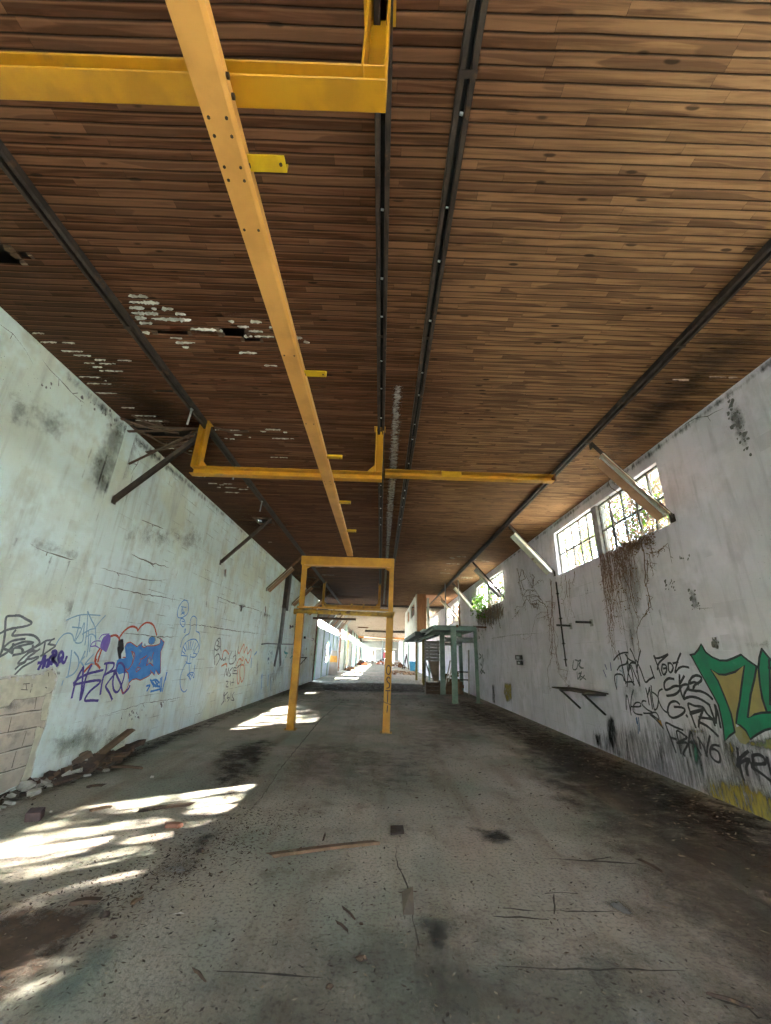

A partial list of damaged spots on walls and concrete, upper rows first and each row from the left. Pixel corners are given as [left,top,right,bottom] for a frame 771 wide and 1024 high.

peeling [128,294,274,354]
peeling [32,332,162,426]
water stain [96,427,132,491]